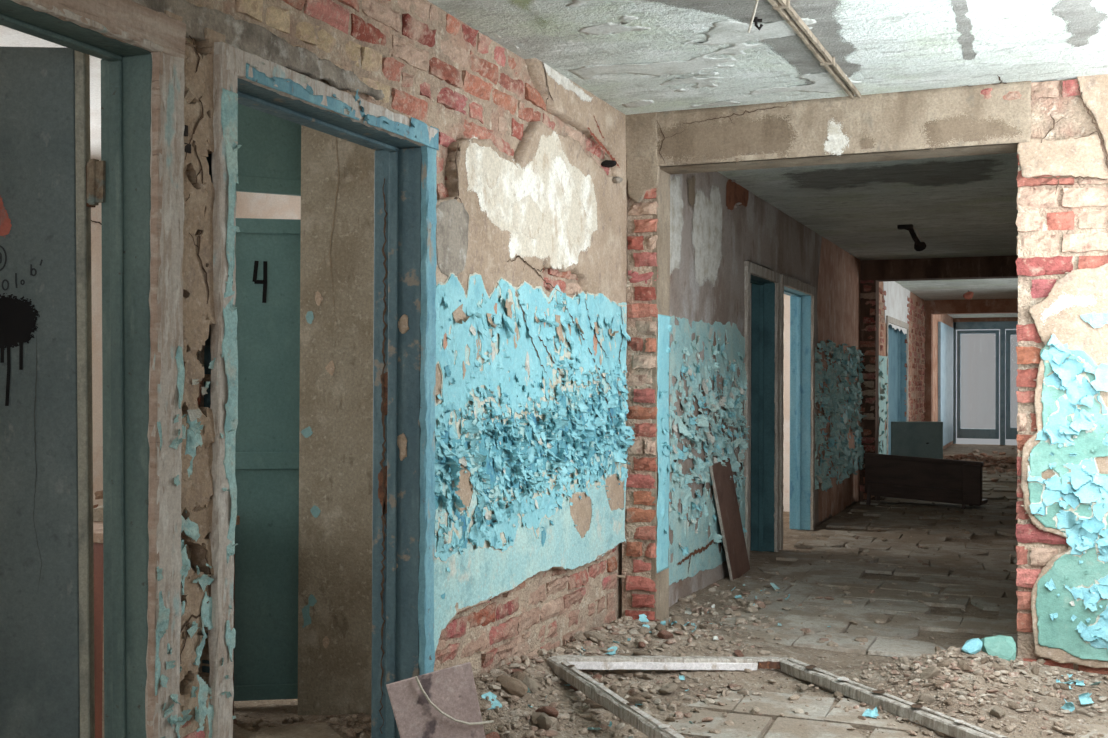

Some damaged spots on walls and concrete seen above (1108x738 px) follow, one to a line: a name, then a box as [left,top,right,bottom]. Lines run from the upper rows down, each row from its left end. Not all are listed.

peeling [568,18,817,92]
damp [644,0,862,89]
damp [951,0,977,60]
damp [1049,0,1108,48]
crack [185,99,209,304]
damp [656,113,799,288]
damp [781,111,1022,192]
flaking render [1016,154,1108,298]
crack [1032,81,1108,194]
peeling [157,88,242,564]
peeling [235,0,750,668]
peeling [1015,324,1108,675]